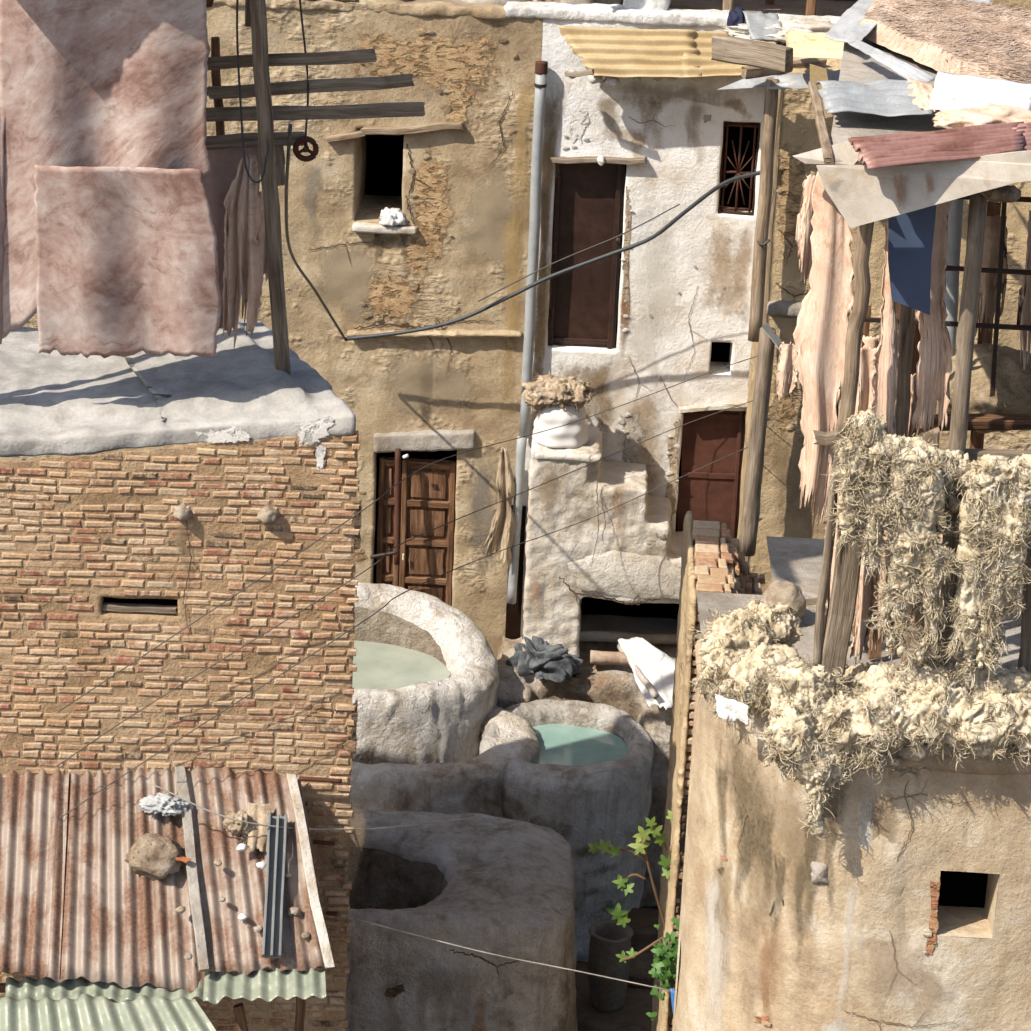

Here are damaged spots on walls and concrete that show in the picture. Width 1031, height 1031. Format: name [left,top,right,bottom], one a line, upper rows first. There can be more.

spalling [353,27,507,132]
crack [487,92,513,168]
spalling [360,146,455,324]
leakage [711,234,749,303]
crack [628,287,706,408]
leakage [636,400,657,482]
crack [183,520,199,638]
leakage [717,754,784,896]
leakage [796,788,842,913]
crack [887,767,993,862]
spalling [922,877,940,955]